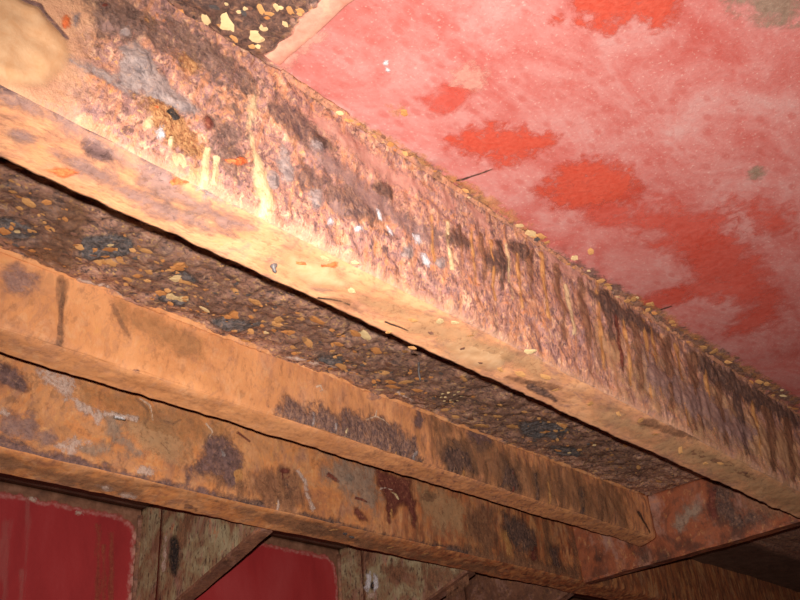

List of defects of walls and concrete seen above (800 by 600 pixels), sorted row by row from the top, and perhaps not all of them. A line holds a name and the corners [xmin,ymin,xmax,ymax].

rust [62,13,80,28]
rust [174,0,306,56]
rust [0,85,42,113]
rust [326,108,394,147]
rust [49,111,254,236]
rust [0,179,68,252]
rust [3,265,38,292]
rust [56,281,64,346]
rust [0,363,27,392]
rust [62,232,641,476]
rust [445,220,800,531]
rust [0,415,417,538]